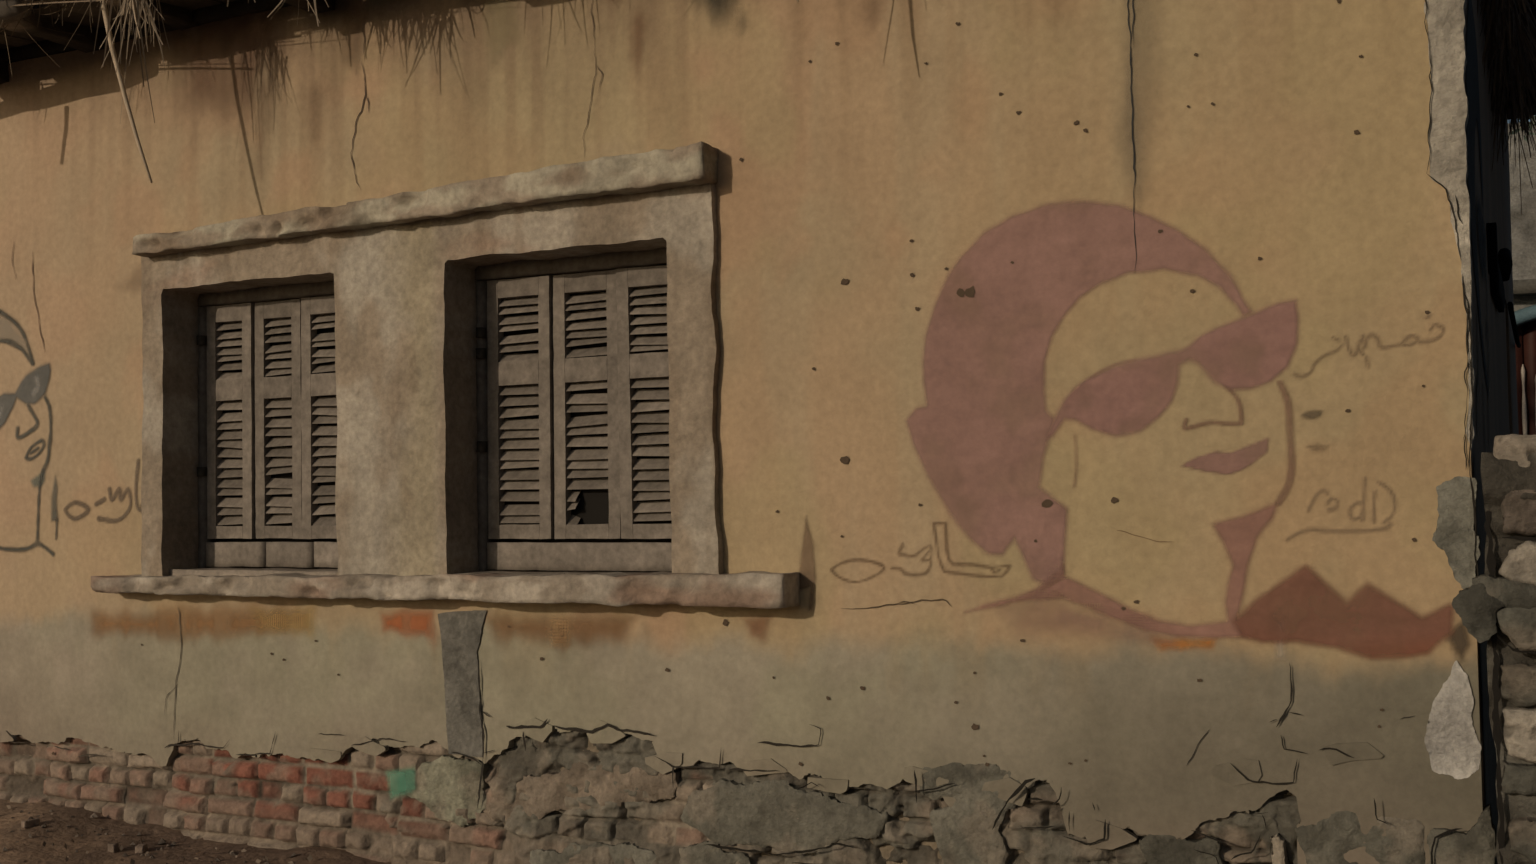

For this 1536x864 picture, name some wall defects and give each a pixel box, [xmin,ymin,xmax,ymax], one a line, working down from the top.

spalling [0,718,949,864]
spalling [982,755,1148,864]
spalling [1208,759,1262,785]
spalling [1187,789,1300,864]
crack [1192,663,1354,864]
spalling [1324,708,1384,765]
crack [1431,633,1536,864]